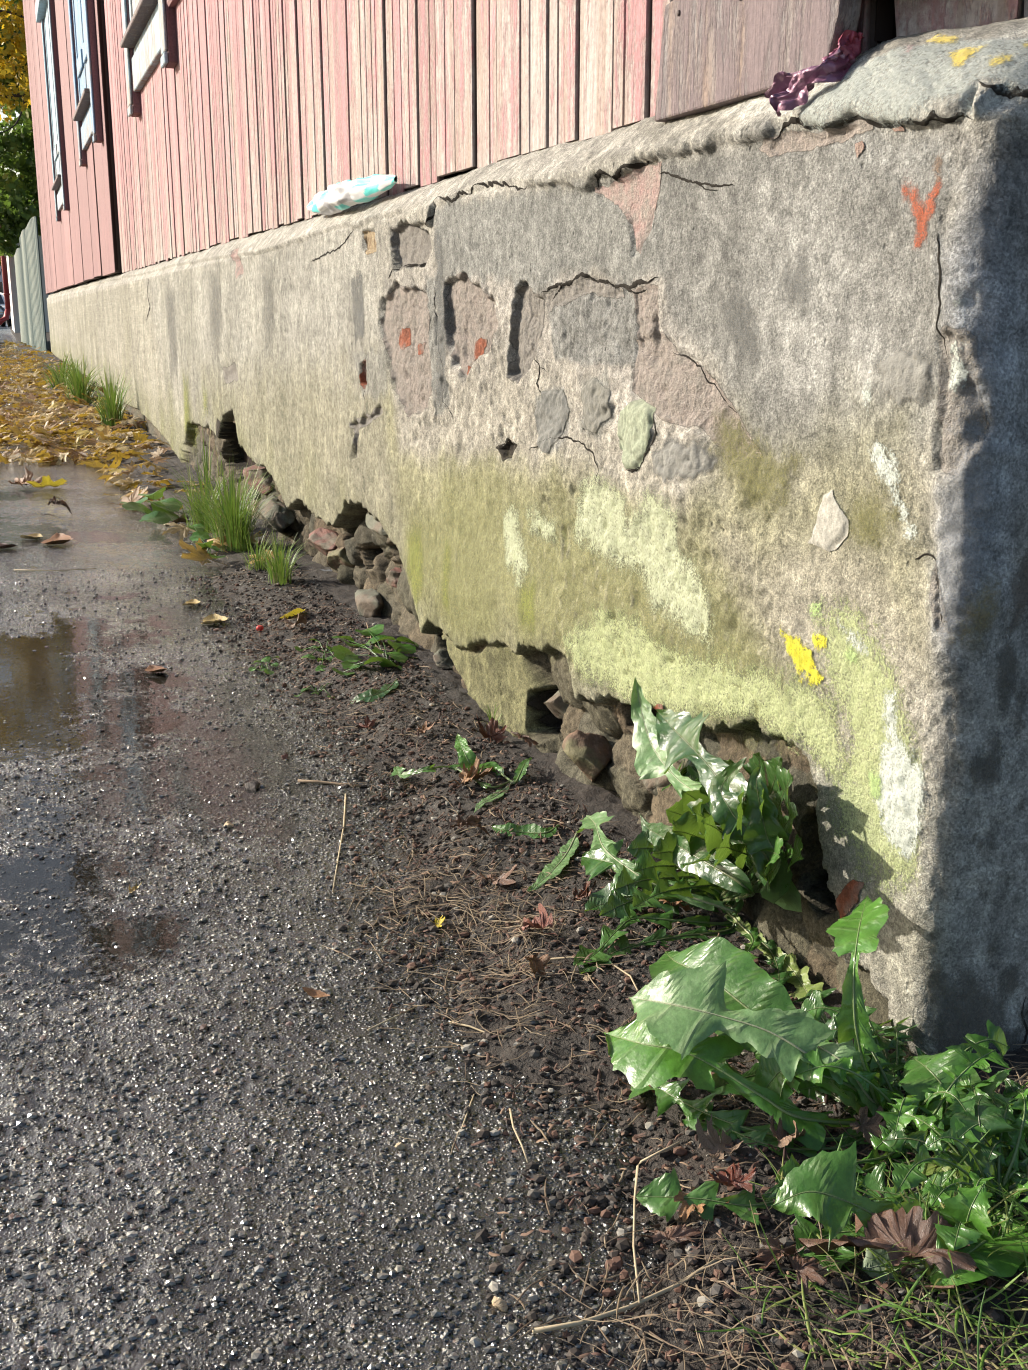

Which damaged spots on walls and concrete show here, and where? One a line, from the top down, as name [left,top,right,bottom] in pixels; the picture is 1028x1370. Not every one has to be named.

crack [776,81,1028,139]
crack [594,161,735,191]
crack [541,272,656,301]
crack [936,233,947,354]
spalling [349,407,383,457]
water stain [868,442,917,547]
crack [916,553,944,625]
water stain [837,622,868,655]
water stain [873,688,926,862]